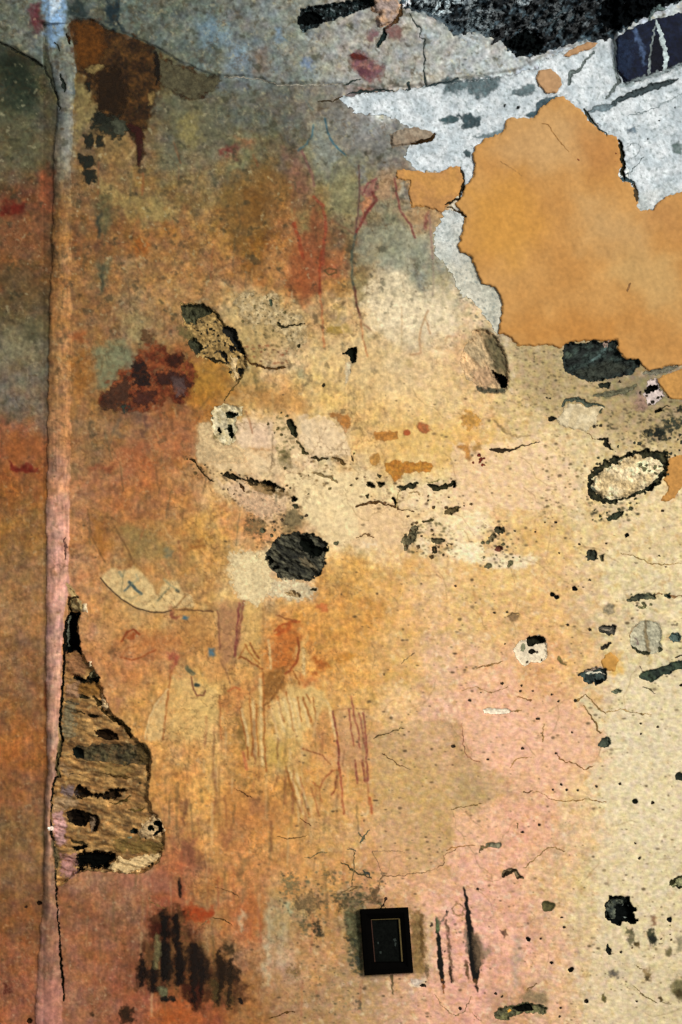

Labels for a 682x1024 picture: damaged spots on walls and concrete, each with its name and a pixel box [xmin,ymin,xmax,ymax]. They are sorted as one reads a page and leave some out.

corrosion [67,19,221,166]
peeling [339,0,682,211]
flaking render [196,403,245,464]
spalling [178,291,307,382]
peeling [433,209,509,394]
flaking render [546,340,678,432]
flaking render [587,448,671,521]
flaking render [229,516,339,607]
spalling [504,635,547,666]
crack [47,537,79,1001]
spalling [50,596,166,886]
damp [136,909,241,1010]